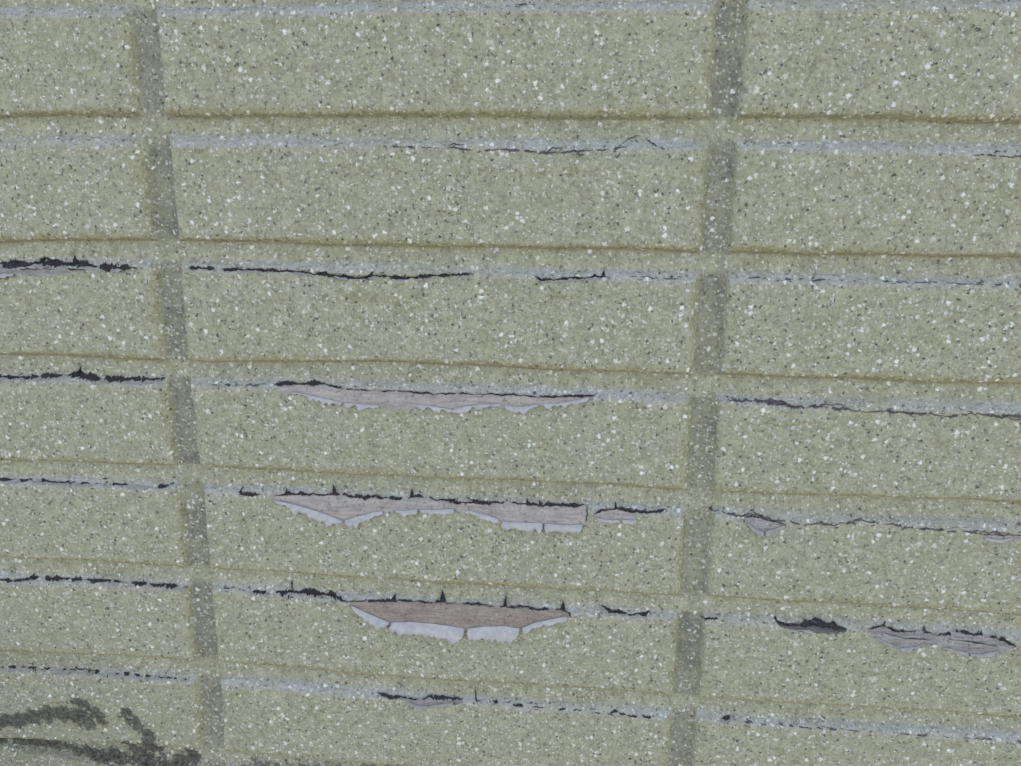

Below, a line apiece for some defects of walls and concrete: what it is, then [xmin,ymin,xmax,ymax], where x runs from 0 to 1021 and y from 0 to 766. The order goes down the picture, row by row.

crack [384,135,664,158]
peeling [0,267,85,279]
crack [188,266,472,281]
crack [0,367,165,386]
peeling [275,379,596,415]
crack [728,394,1021,421]
peeling [239,484,666,534]
crack [709,505,1021,537]
crack [0,574,187,592]
peeling [336,590,571,644]
peeling [773,616,847,635]
peeling [867,622,1016,659]